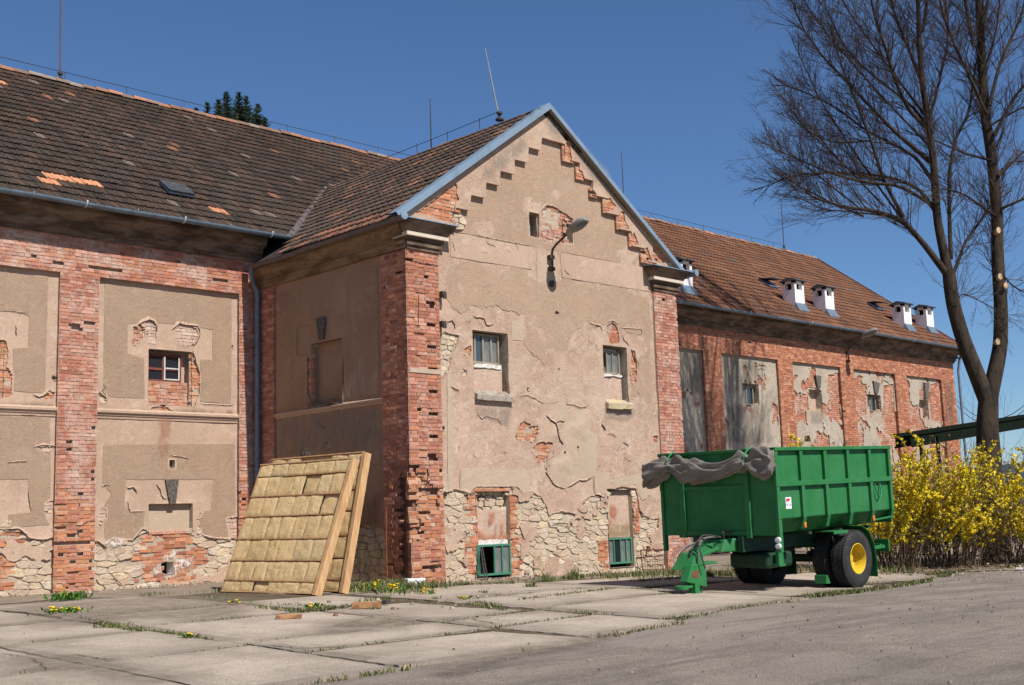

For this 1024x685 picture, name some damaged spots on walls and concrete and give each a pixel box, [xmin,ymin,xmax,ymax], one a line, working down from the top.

spalling [535,206,573,243]
spalling [132,320,156,346]
spalling [0,340,14,398]
spalling [432,332,475,377]
spalling [827,373,840,406]
spalling [882,384,895,415]
spalling [928,382,943,423]
spalling [515,421,552,463]
crack [520,394,631,533]